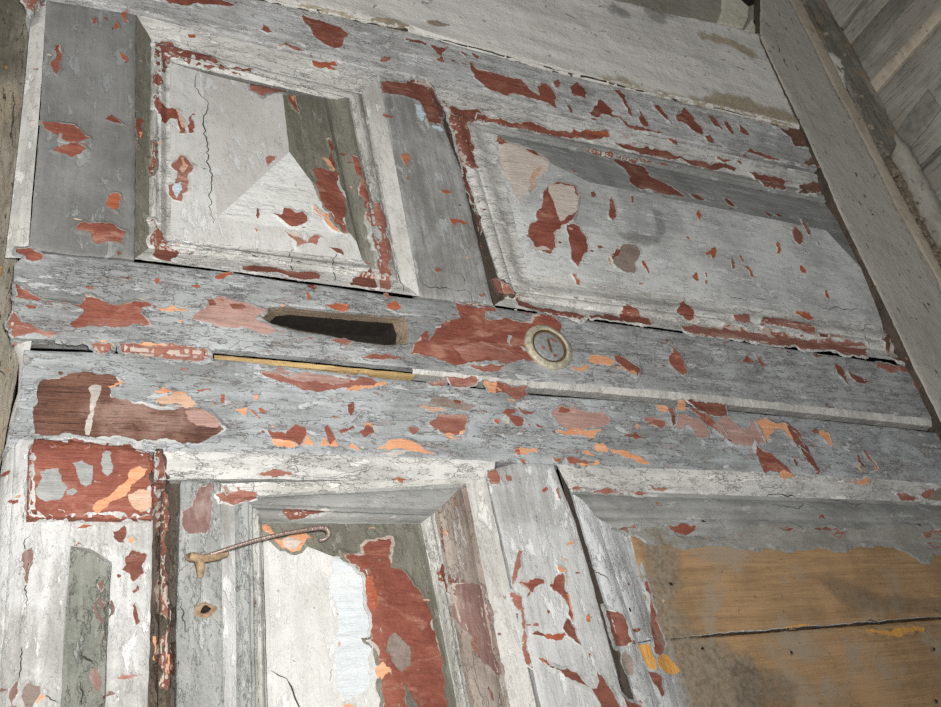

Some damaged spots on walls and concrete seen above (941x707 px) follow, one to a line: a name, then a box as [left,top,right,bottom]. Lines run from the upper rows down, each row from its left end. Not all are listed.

peeling [157,0,241,10]
crack [195,73,215,223]
peeling [377,37,821,286]
peeling [253,136,401,311]
peeling [214,263,323,301]
peeling [623,397,834,486]
peeling [0,277,669,707]
peeling [611,514,941,564]
peeling [600,577,680,699]
crack [620,616,941,646]
peeling [857,623,926,640]
crack [272,671,301,707]